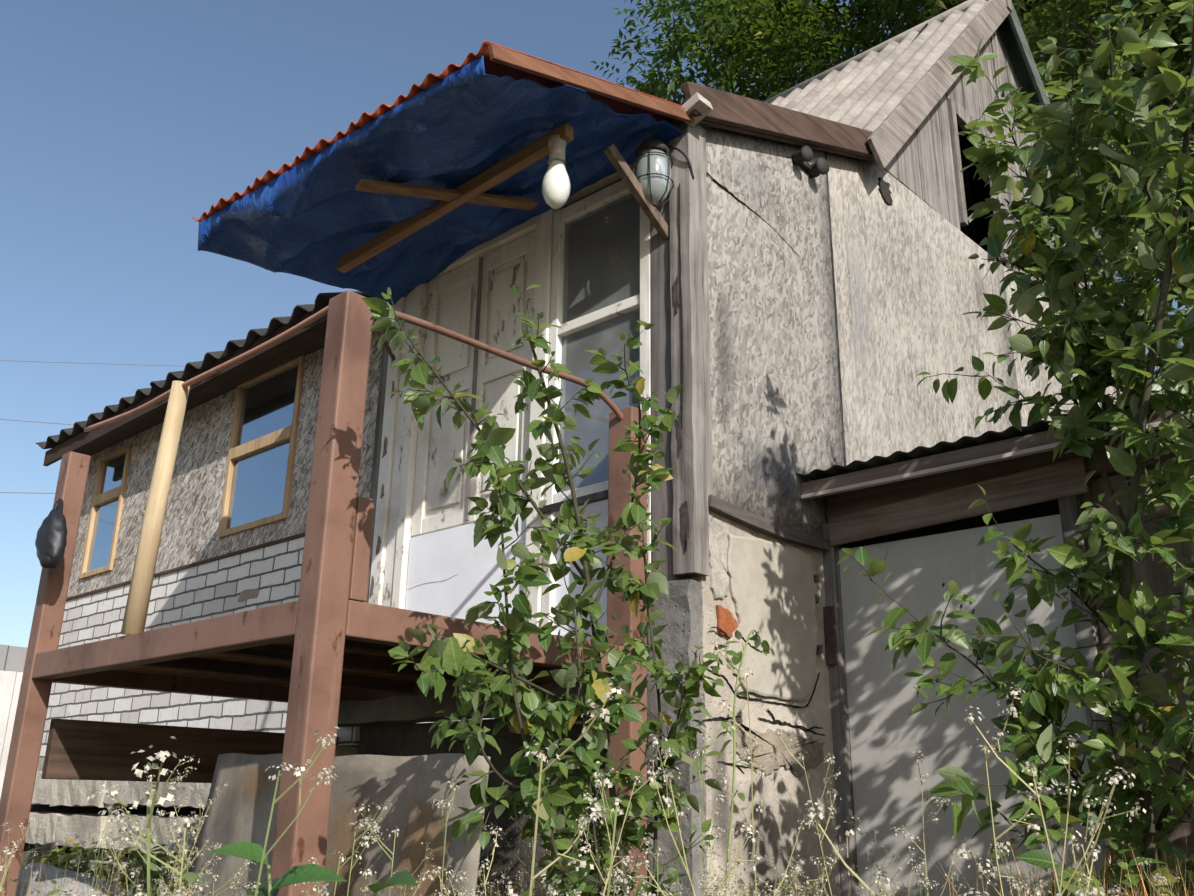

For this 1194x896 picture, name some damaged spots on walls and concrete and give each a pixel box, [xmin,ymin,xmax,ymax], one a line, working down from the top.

spalling [709,515,738,638]
crack [701,627,825,736]
crack [718,761,757,774]